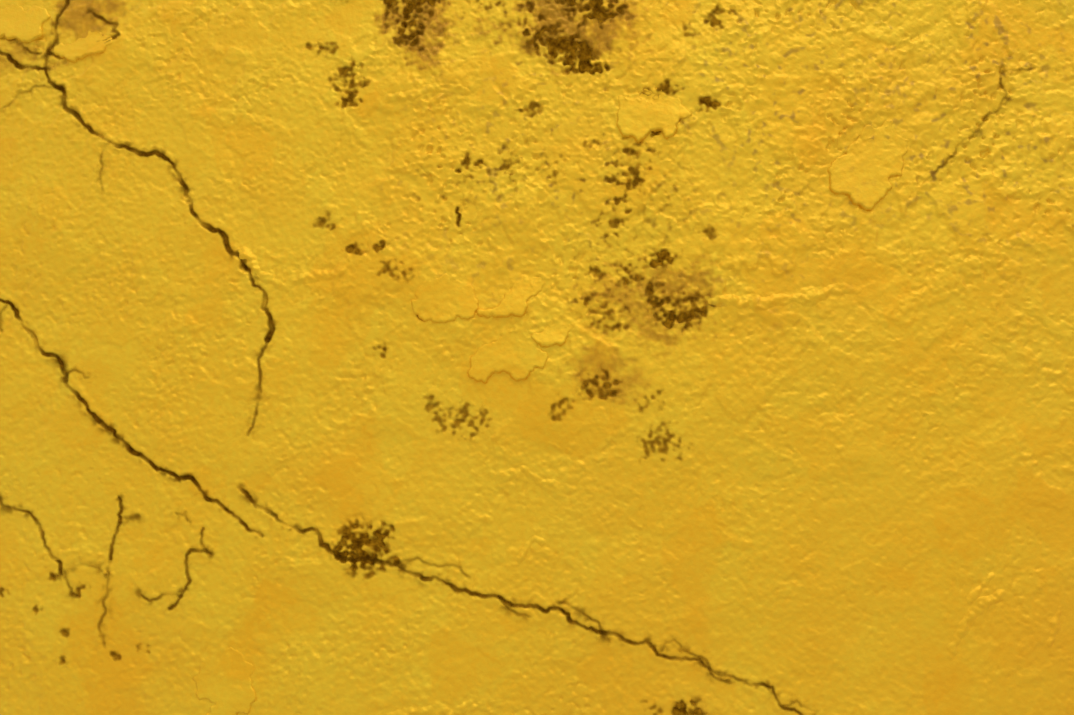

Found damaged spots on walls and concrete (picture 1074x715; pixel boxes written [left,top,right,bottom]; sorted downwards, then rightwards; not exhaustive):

crack [0,0,275,431]
crack [0,498,62,575]
crack [40,349,708,668]
crack [732,676,802,715]